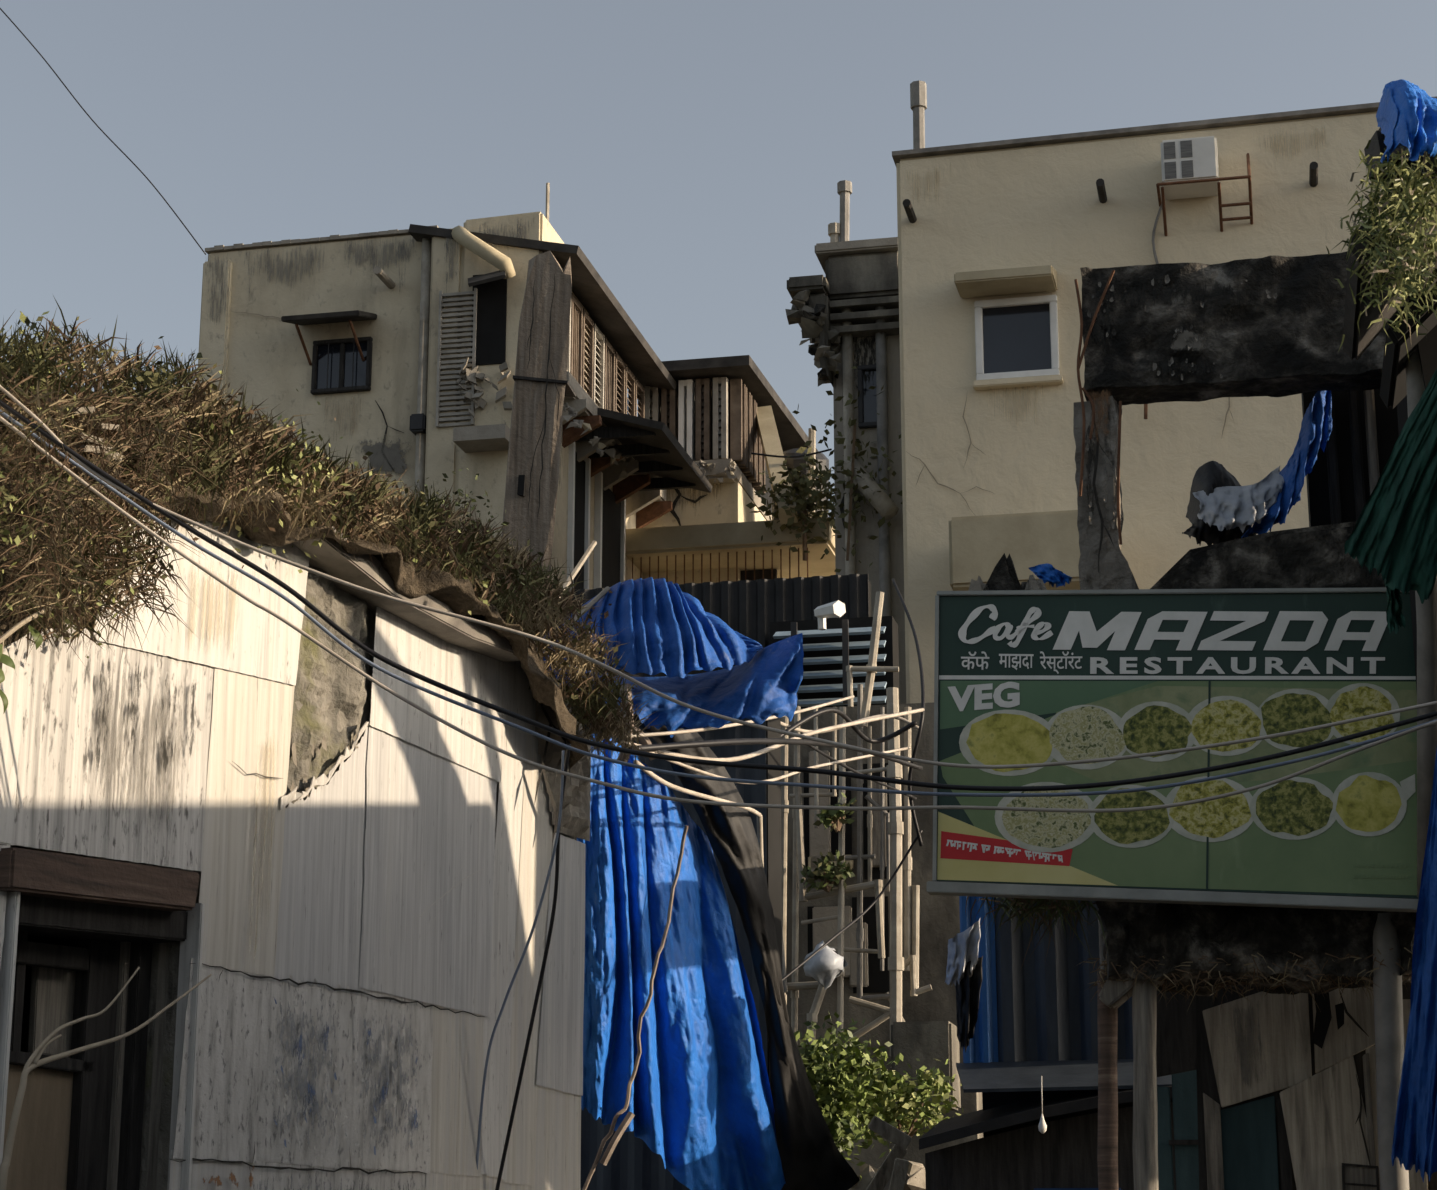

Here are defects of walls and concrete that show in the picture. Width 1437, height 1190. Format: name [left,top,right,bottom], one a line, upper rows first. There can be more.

damp [95,660,196,825]
peeling [285,565,371,807]